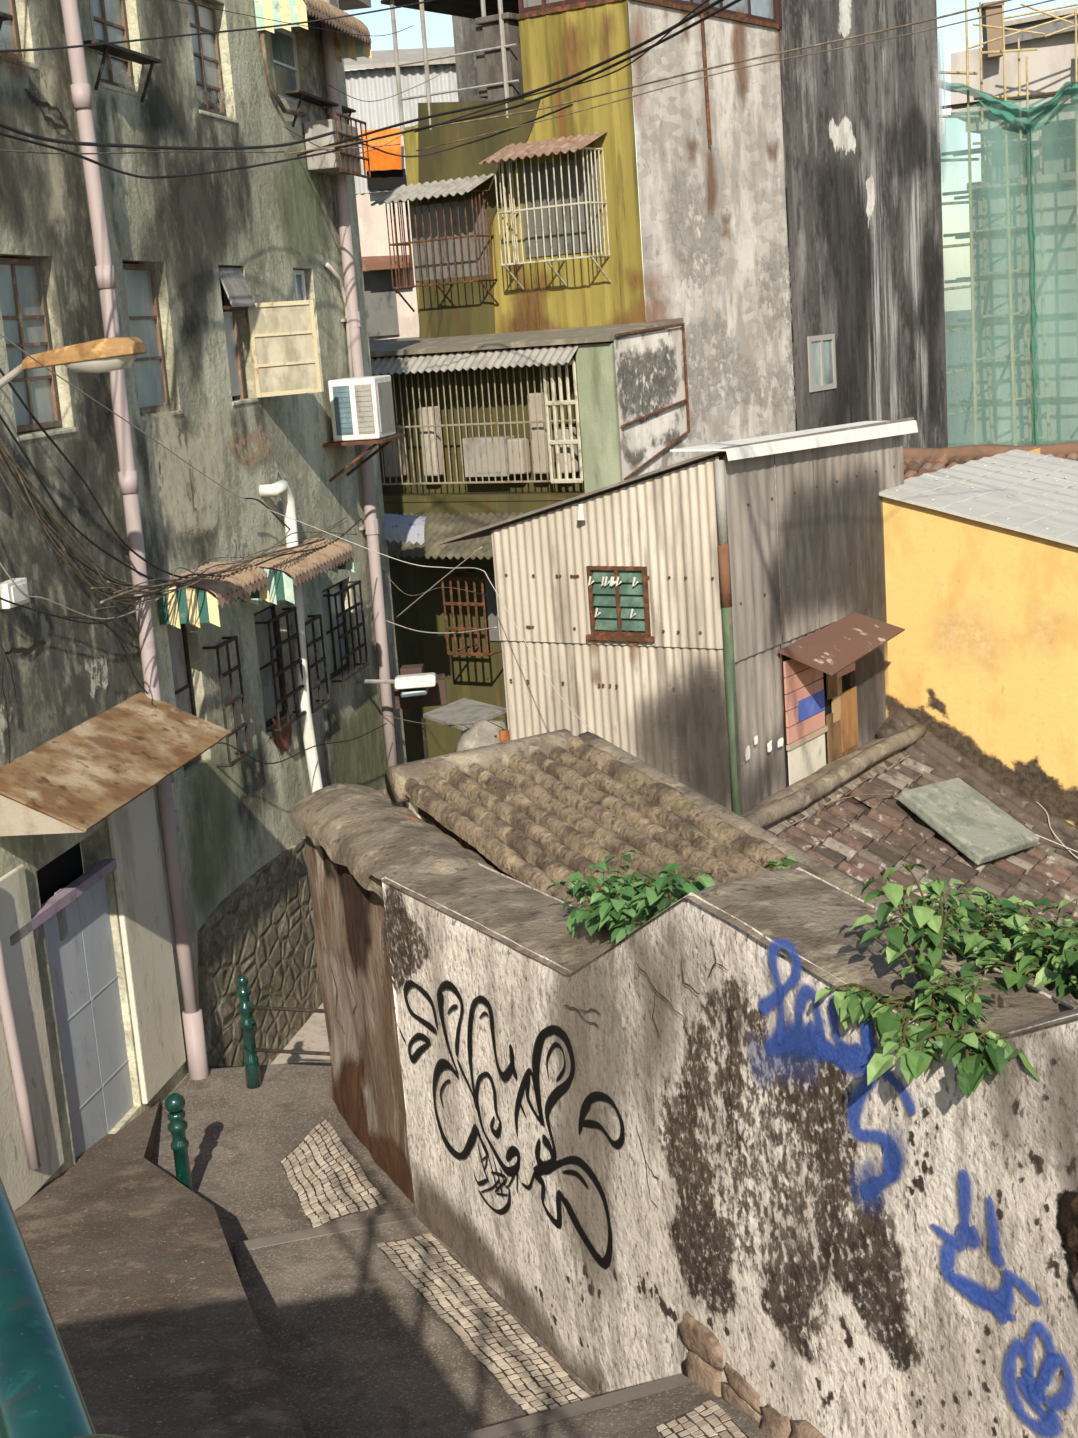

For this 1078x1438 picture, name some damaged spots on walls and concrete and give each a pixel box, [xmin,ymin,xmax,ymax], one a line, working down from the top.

water stain [99,97,122,163]
water stain [144,0,249,376]
rust [503,276,547,333]
water stain [862,152,898,421]
water stain [910,183,922,306]
water stain [915,338,927,406]
water stain [927,38,946,141]
water stain [770,471,887,640]
water stain [848,642,1078,828]
water stain [320,846,601,1396]
peeling [996,1134,1044,1183]
spalling [1035,1157,1078,1309]